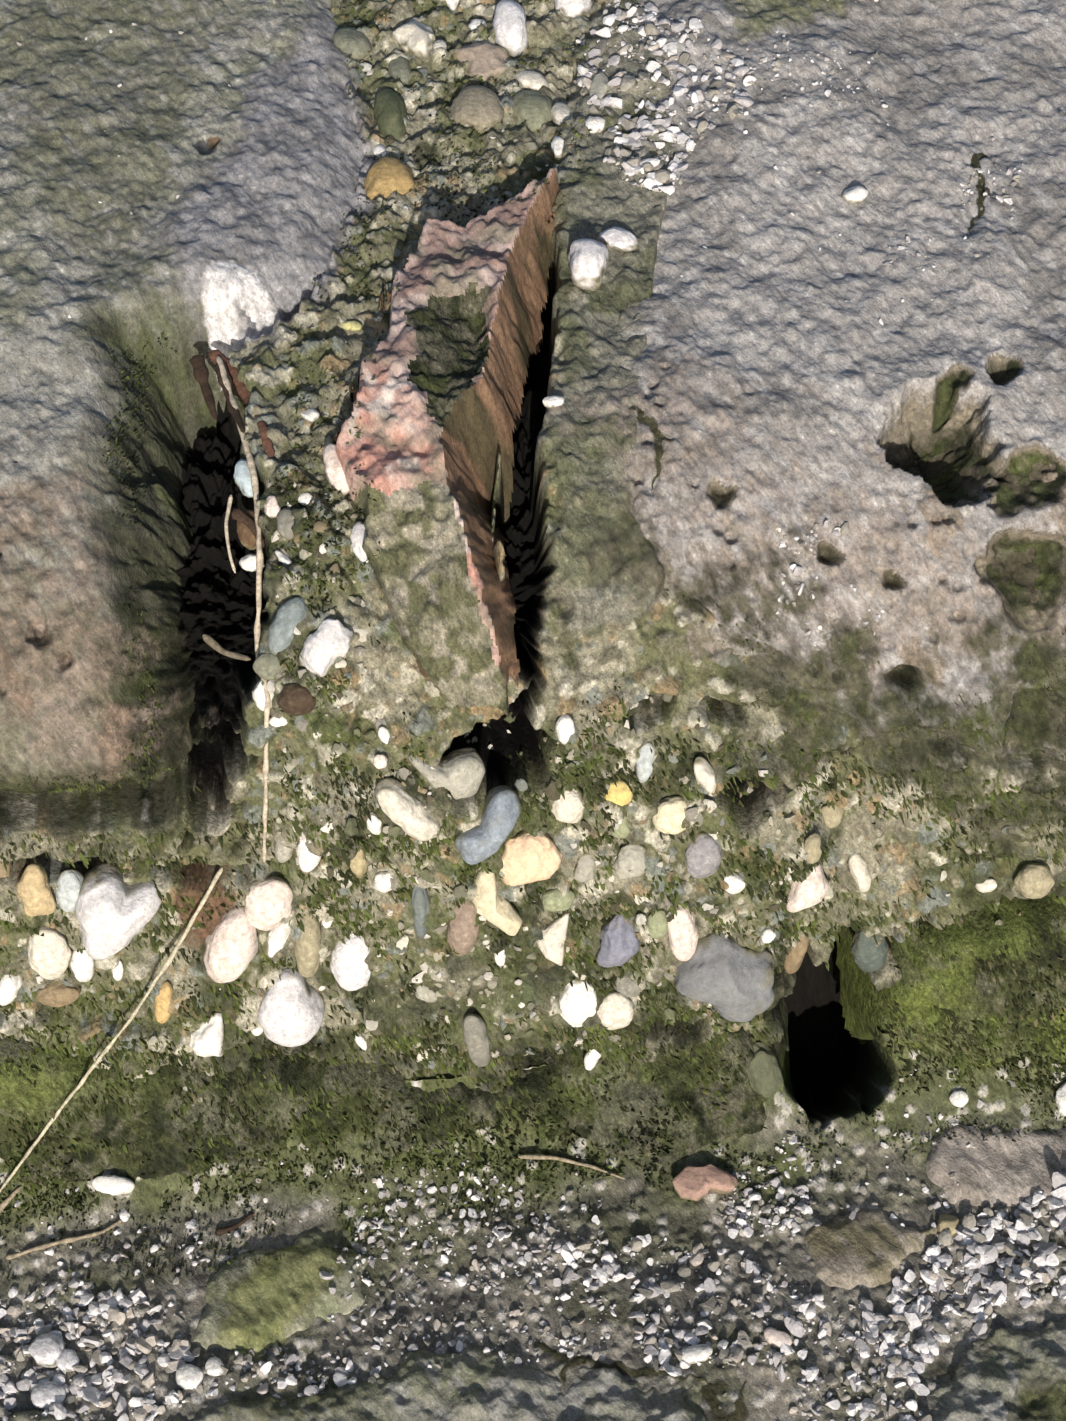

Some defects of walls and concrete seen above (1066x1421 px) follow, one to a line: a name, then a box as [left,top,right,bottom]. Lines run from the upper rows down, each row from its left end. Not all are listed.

spalling [341,321,362,331]
spalling [542,396,564,408]
hole [879,353,1066,632]
spalling [298,618,354,678]
spalling [884,664,923,687]
spalling [760,929,776,943]
spalling [784,937,809,974]
crack [534,1340,748,1421]